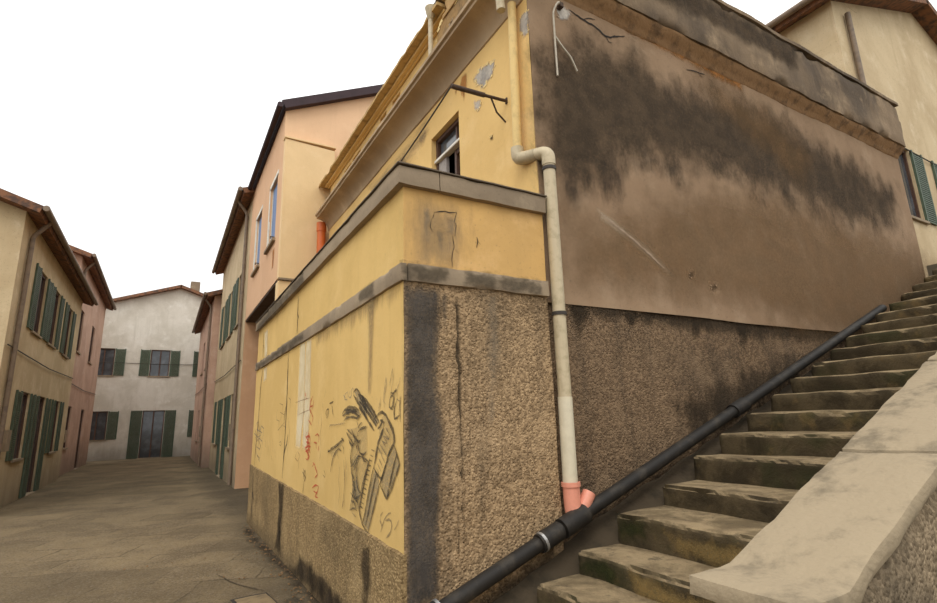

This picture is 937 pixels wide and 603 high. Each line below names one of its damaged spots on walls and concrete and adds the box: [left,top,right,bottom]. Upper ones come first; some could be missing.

peeling [436,0,468,42]
leakage [669,0,796,65]
peeling [473,60,496,88]
leakage [535,36,894,226]
crack [430,211,457,266]
leakage [246,484,339,603]